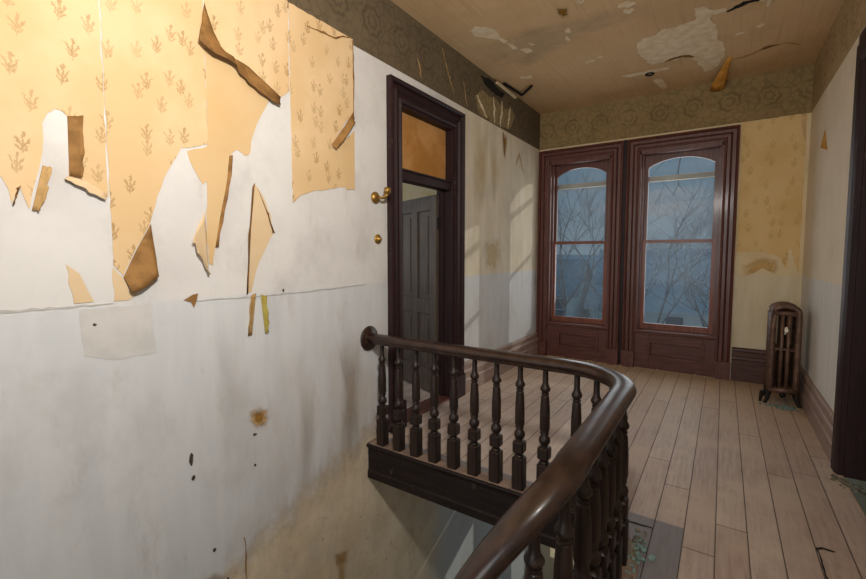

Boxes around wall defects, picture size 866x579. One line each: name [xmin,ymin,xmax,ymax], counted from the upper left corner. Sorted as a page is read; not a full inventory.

crack [726,0,772,12]
peeling [470,26,535,54]
peeling [621,6,727,89]
crack [732,42,799,60]